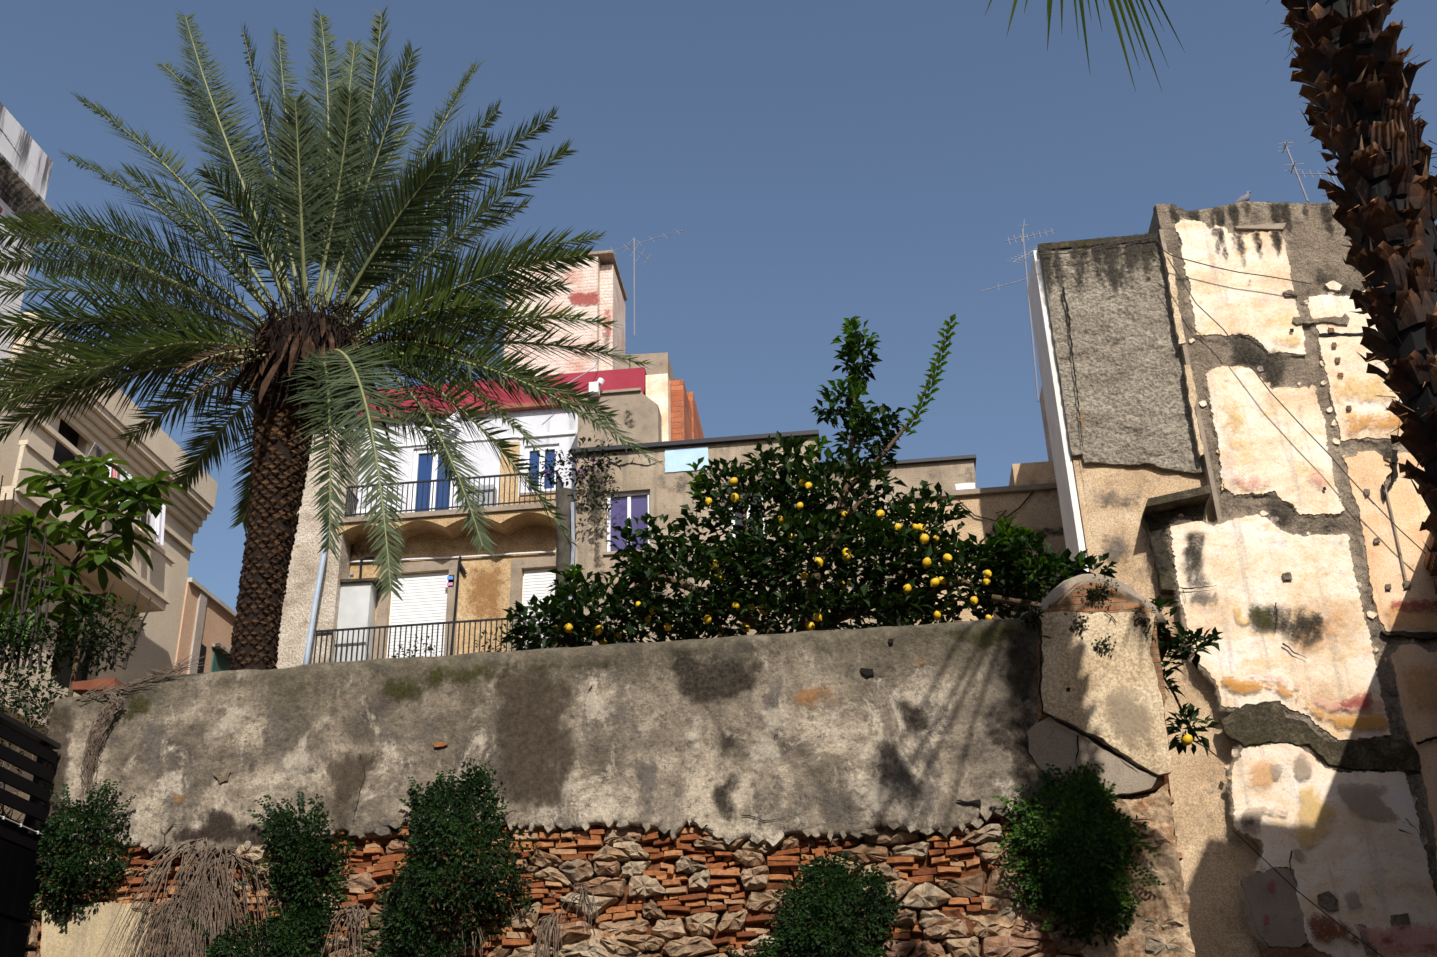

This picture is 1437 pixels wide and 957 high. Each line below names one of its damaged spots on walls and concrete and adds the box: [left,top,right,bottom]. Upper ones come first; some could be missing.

damp [1170,202,1335,264]
damp [1038,233,1159,303]
flaking render [1163,218,1437,957]
damp [1260,606,1340,646]
damp [673,648,762,701]
flaking render [1040,611,1171,777]
damp [496,671,614,806]
spalling [118,836,225,856]
spalling [244,816,417,850]
spalling [490,816,785,849]
damp [713,773,738,818]
spalling [802,799,1029,842]